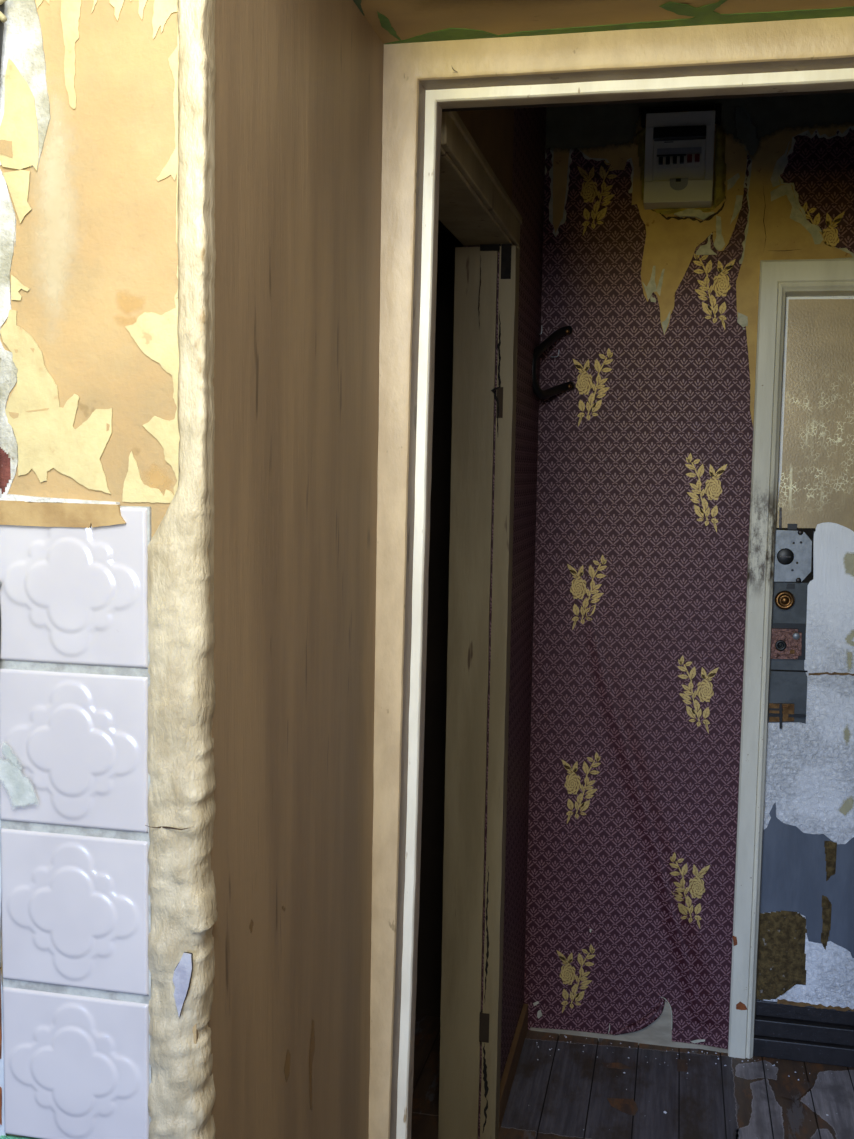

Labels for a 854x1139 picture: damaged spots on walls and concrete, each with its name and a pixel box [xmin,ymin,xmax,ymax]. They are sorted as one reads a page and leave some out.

peeling [0,0,180,503]
peeling [501,1038,784,1139]
peeling [801,1070,854,1139]